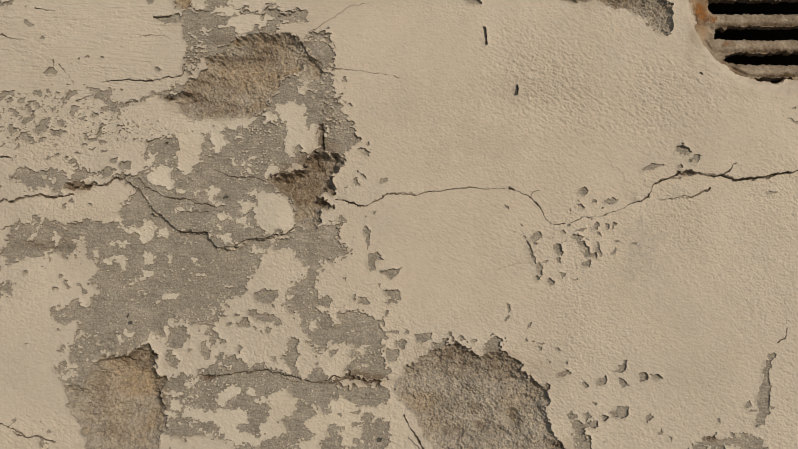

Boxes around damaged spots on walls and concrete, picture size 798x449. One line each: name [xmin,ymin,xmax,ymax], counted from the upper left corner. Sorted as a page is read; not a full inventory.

spalling [561,0,674,36]
crack [335,163,798,225]
peeling [570,187,619,214]
peeling [0,0,565,449]
peeling [514,218,620,285]
peeling [582,360,629,388]
peeling [688,352,776,449]
crack [403,414,424,449]
peeling [567,406,629,449]